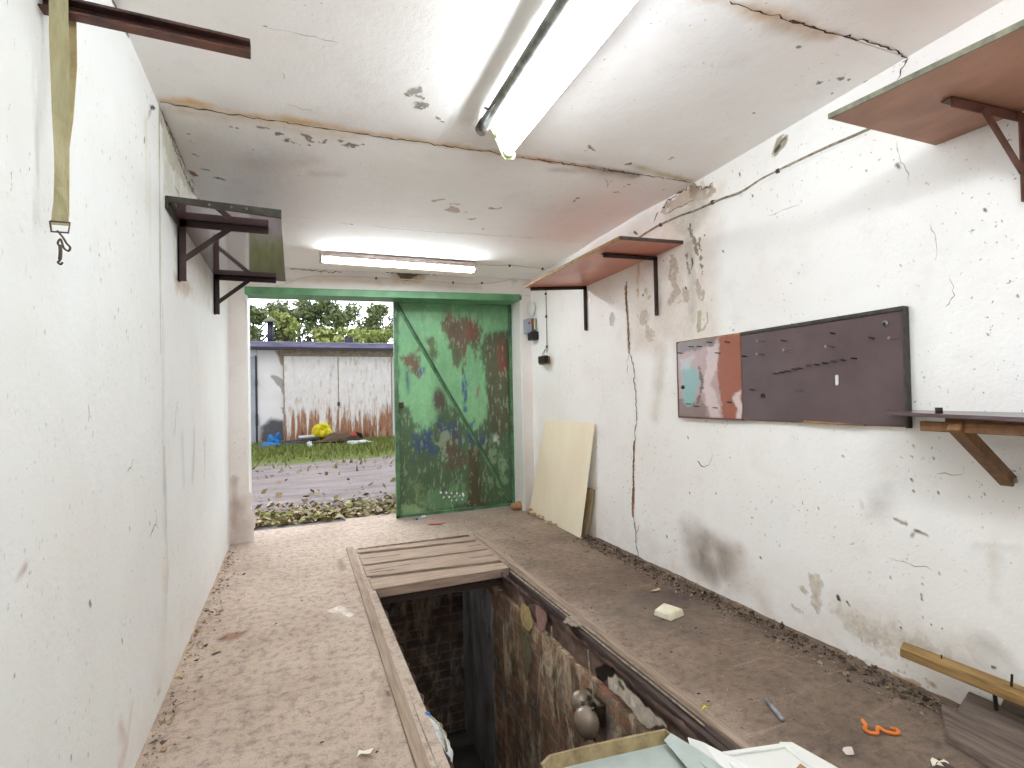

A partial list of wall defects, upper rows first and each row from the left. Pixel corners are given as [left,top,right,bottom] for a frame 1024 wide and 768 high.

crack [730,1,908,80]
peeling [253,125,365,149]
peeling [401,85,445,123]
crack [160,102,693,187]
water stain [175,77,680,188]
flaking render [654,181,713,221]
peeling [663,223,712,333]
crack [624,286,639,551]